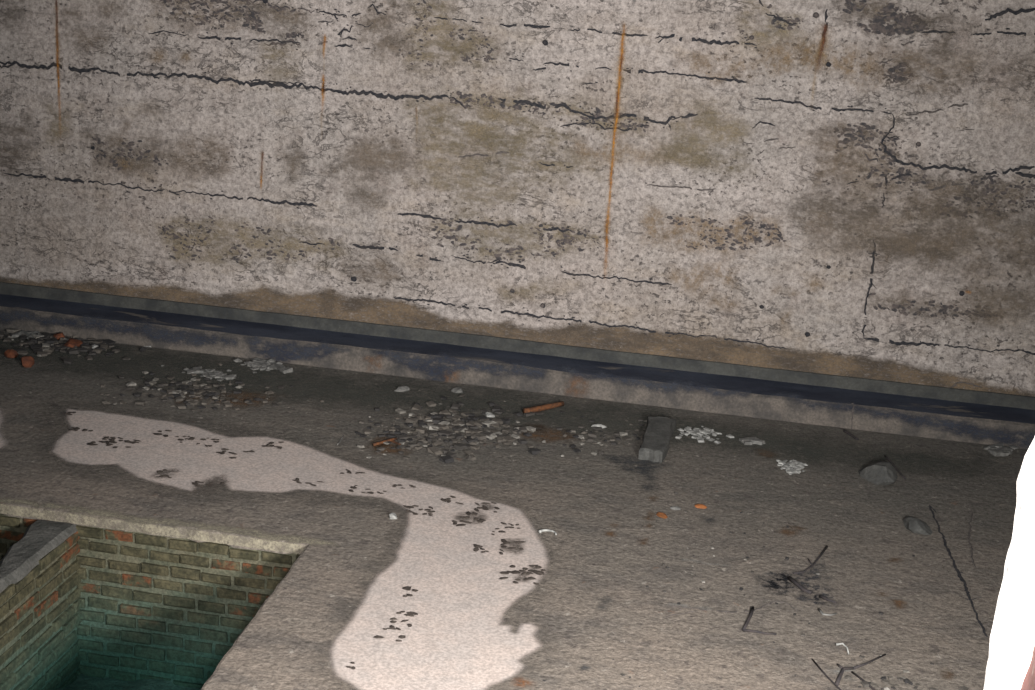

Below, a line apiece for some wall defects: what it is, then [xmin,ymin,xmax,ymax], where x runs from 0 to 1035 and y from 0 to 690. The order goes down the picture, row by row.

crack [0,57,466,108]
rust [606,31,624,250]
crack [3,170,317,209]
crack [353,241,526,270]
crack [398,208,517,228]
crack [544,224,572,233]
crack [561,266,672,290]
damp [800,196,1035,269]
crack [861,241,1035,355]
damp [0,278,1035,397]
damp [0,310,663,433]
damp [671,421,969,472]